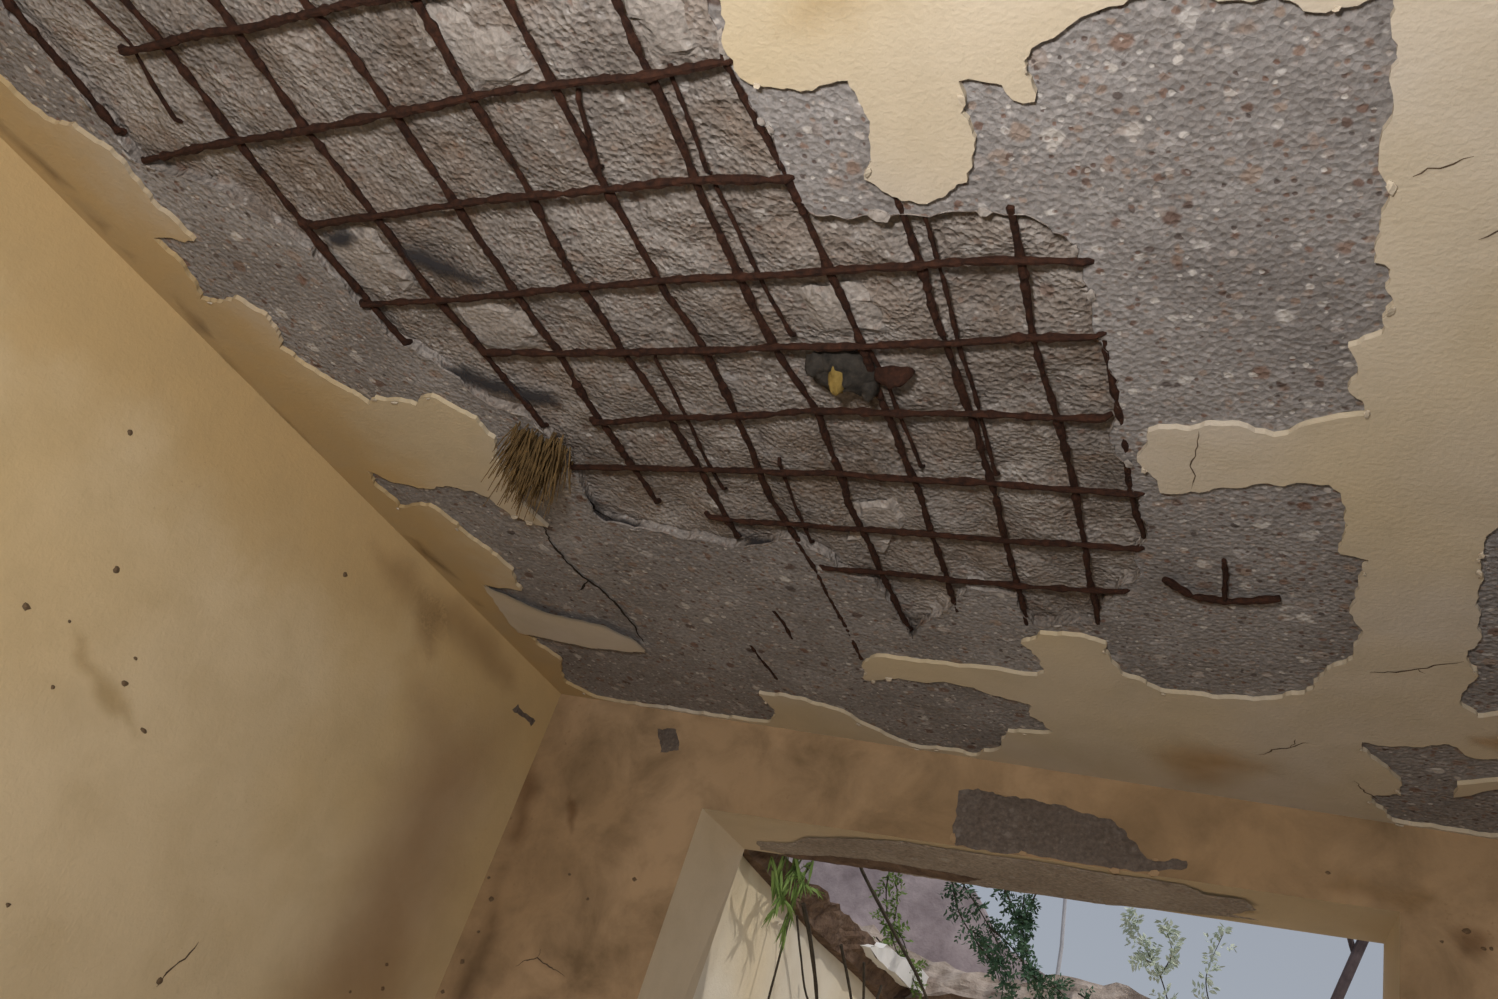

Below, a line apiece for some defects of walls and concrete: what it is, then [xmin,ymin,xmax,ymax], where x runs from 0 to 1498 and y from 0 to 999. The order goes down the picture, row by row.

peeling [0,0,1398,753]
peeling [1461,528,1498,713]
peeling [1359,742,1498,833]
peeling [743,788,1258,999]